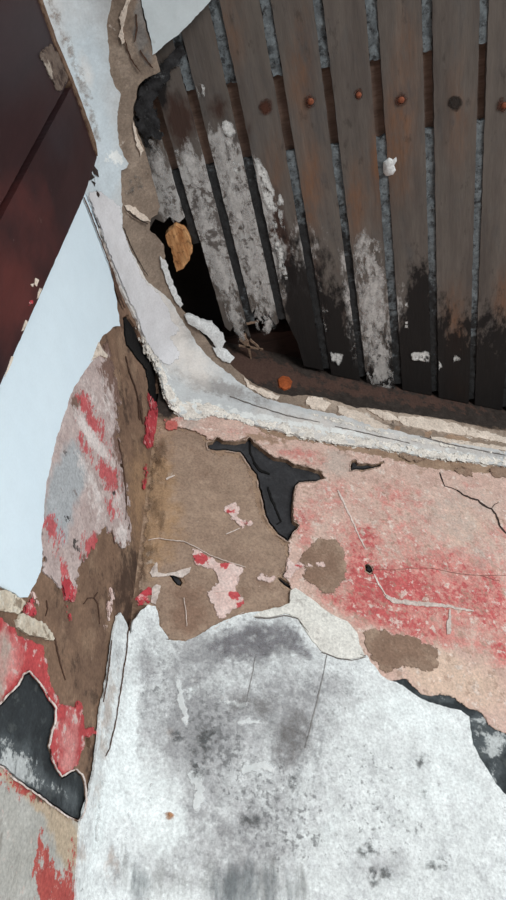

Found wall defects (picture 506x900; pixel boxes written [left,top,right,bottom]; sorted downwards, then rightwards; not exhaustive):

flaking render [118,0,130,44]
flaking render [124,205,151,222]
efflorescence [217,121,272,331]
efflorescence [255,160,287,274]
efflorescence [212,251,243,336]
efflorescence [356,235,390,388]
efflorescence [411,352,429,361]
peeling [41,342,132,626]
flaking render [123,317,506,794]
crack [439,472,506,533]
spalling [0,590,97,821]
crack [305,655,327,748]